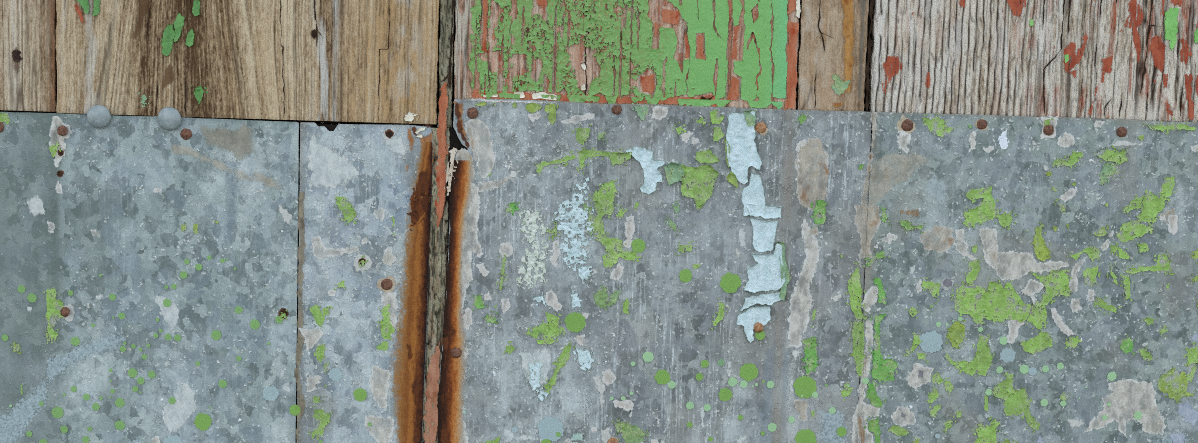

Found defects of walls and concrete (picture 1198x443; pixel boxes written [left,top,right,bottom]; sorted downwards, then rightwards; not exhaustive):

peeling [74,0,100,22]
peeling [161,0,201,56]
rust [834,0,854,107]
peeling [882,56,902,93]
peeling [1007,0,1034,26]
peeling [1053,33,1088,79]
peeling [1087,56,1113,115]
peeling [1120,0,1198,141]
peeling [922,113,971,137]
peeling [468,0,809,402]
rust [390,101,475,443]
peeling [840,146,1198,443]